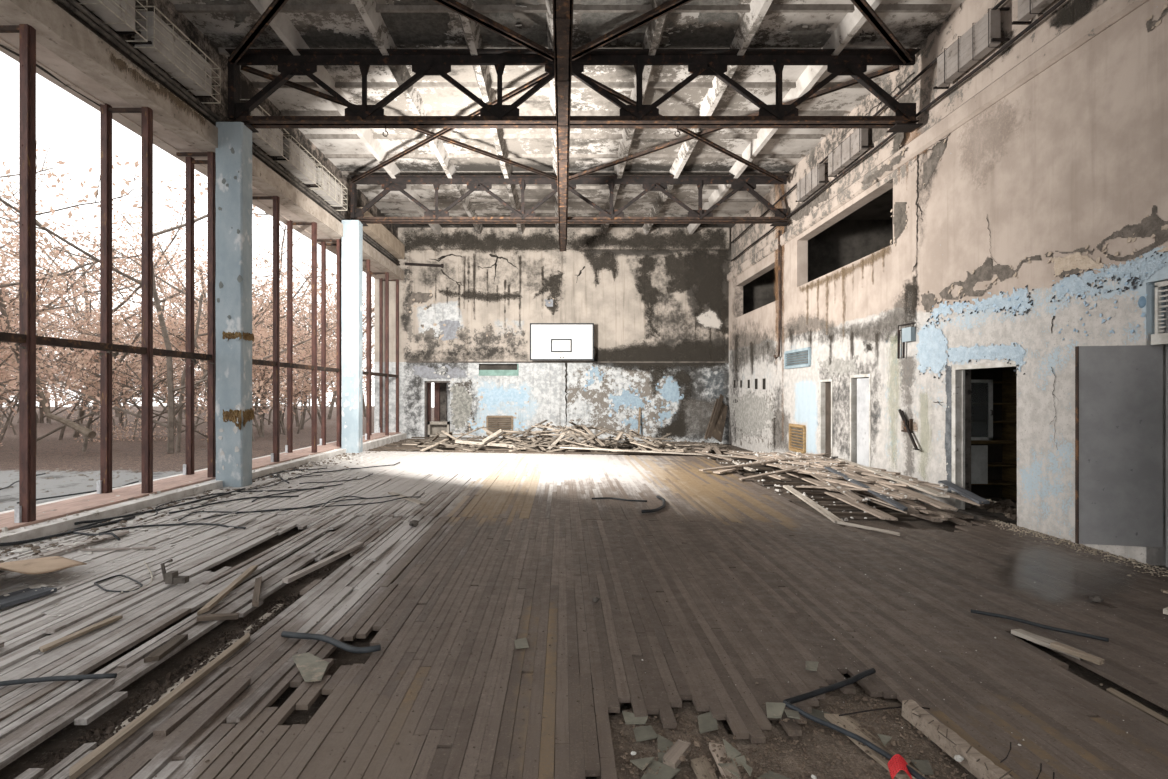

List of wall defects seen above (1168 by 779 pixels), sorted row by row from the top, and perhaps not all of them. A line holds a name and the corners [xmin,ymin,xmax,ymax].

peeling [300,27,377,48]
peeling [380,0,455,48]
peeling [473,0,548,48]
peeling [574,0,650,48]
peeling [662,0,739,48]
peeling [786,24,831,47]
damp [1052,0,1092,26]
corrosion [775,226,784,381]
damp [403,224,919,441]
peeling [916,205,1168,493]